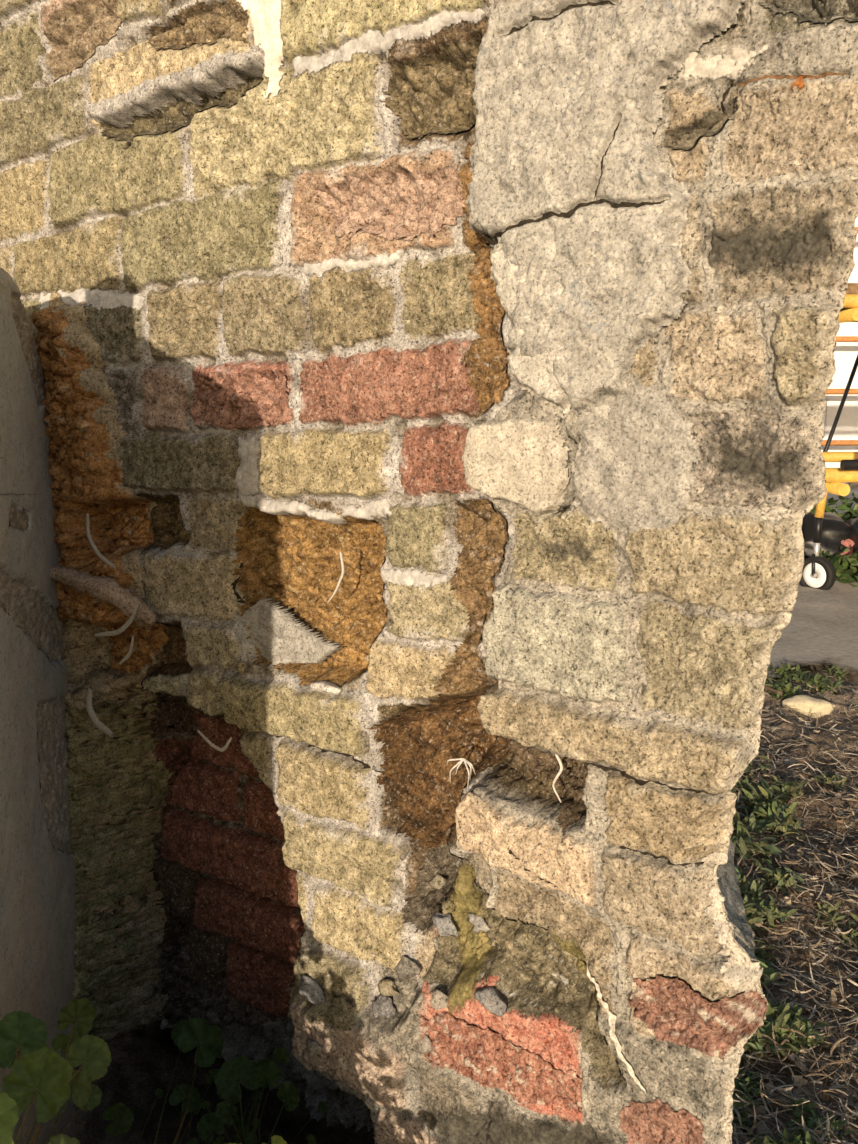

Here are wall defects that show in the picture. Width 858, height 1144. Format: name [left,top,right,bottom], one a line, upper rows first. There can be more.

crack [503,1,616,36]
crack [474,119,668,245]
peeling [86,514,116,569]
spalling [0,569,64,662]
peeling [94,601,139,665]
spalling [233,507,388,695]
peeling [86,688,115,742]
spalling [369,680,589,850]
spalling [113,622,306,1028]